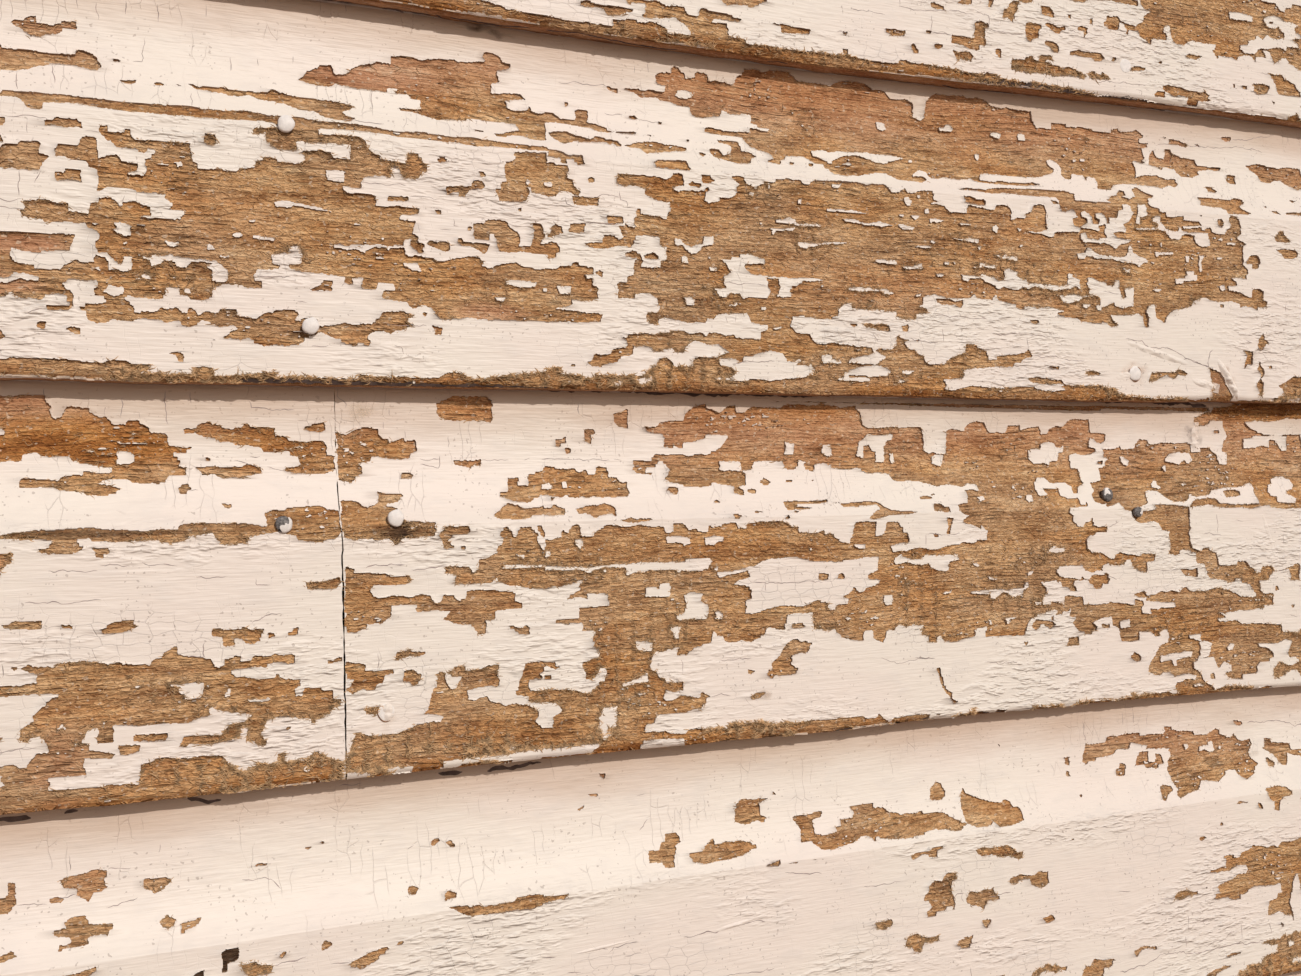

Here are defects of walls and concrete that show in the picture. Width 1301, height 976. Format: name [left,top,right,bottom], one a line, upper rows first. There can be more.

peeling [0,16,101,71]
peeling [380,0,1080,93]
peeling [1002,0,1103,77]
peeling [1104,0,1301,120]
peeling [0,53,1301,812]
peeling [54,869,113,949]
peeling [451,894,568,917]
peeling [648,833,756,868]
peeling [734,798,766,824]
peeling [792,782,1023,859]
peeling [924,872,996,917]
peeling [1212,837,1301,915]